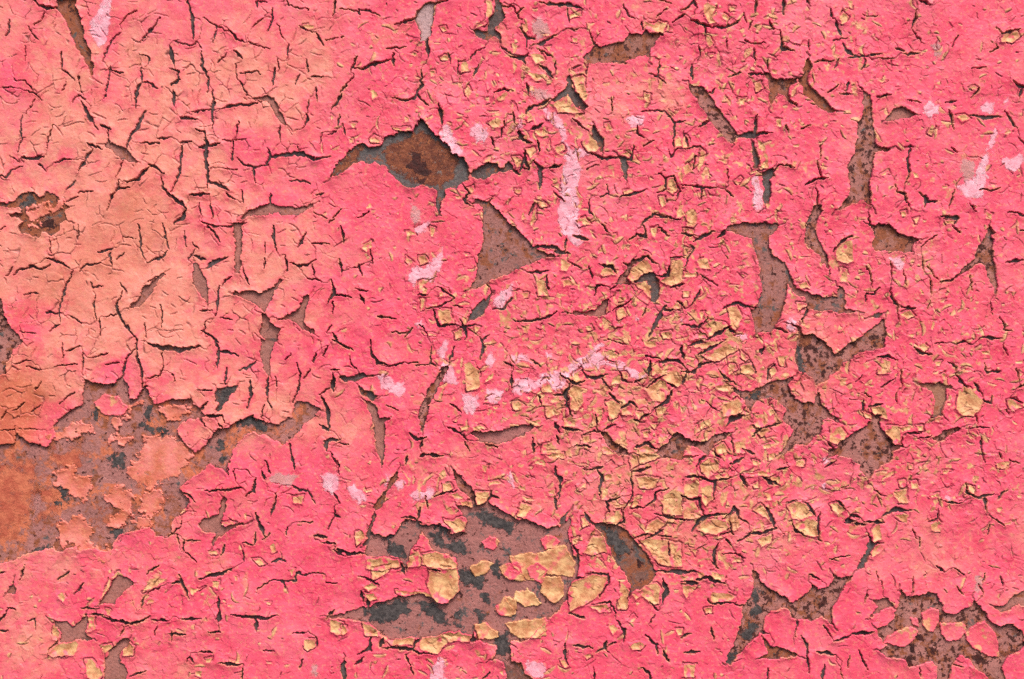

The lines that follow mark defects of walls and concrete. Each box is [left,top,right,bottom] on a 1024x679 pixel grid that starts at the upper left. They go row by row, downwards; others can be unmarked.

rust [331,144,365,176]
rust [381,128,459,189]
peeling [551,21,667,113]
crack [623,0,928,103]
peeling [738,55,837,113]
peeling [839,87,915,210]
crack [945,28,1024,153]
peeling [331,116,572,340]
crack [0,0,595,679]
peeling [327,204,984,679]
crack [505,110,1024,679]
peeling [870,590,1024,679]